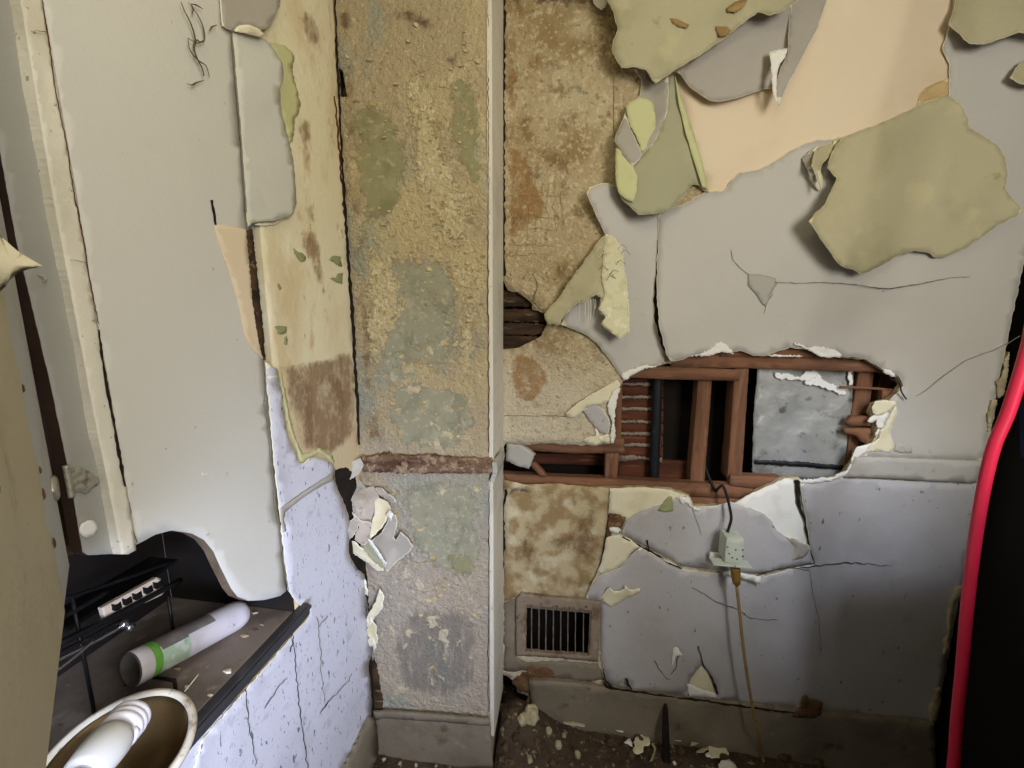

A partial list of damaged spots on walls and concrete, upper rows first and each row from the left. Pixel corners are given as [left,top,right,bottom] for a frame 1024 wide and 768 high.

peeling [219,0,301,227]
damp [287,356,352,451]
peeling [503,0,1024,723]
crack [764,277,957,313]
peeling [193,362,436,768]
crack [757,480,890,654]